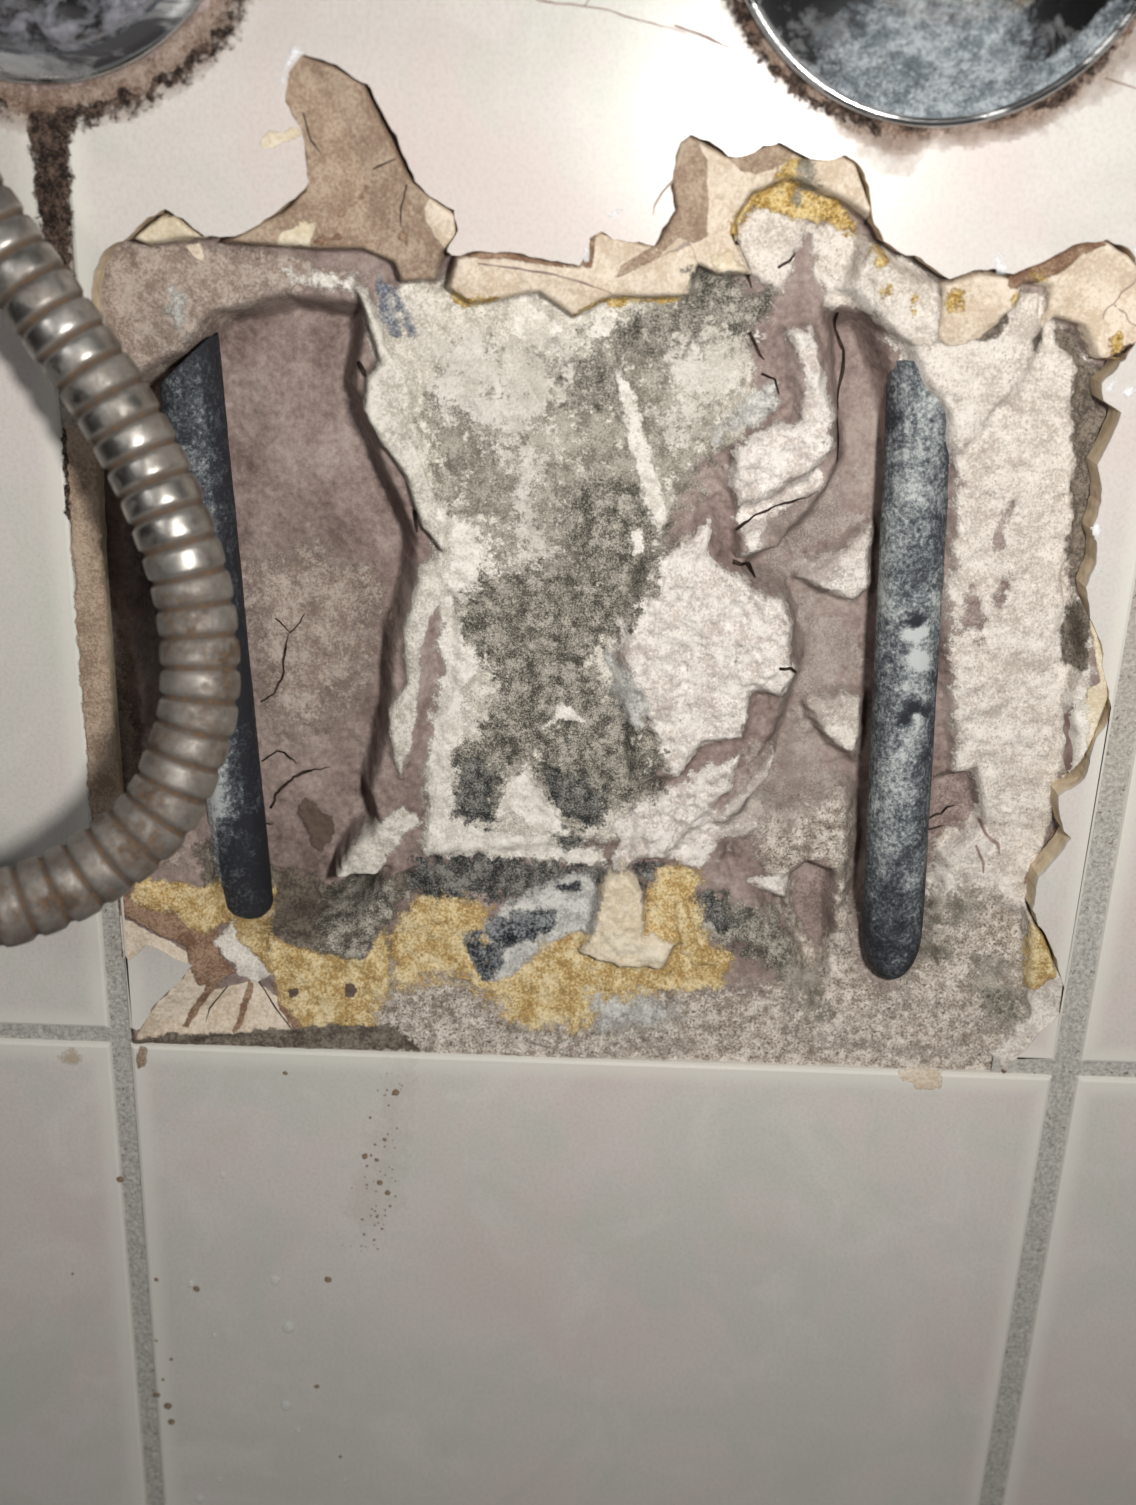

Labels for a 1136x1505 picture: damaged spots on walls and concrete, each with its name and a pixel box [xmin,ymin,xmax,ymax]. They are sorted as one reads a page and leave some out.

water stain [26,109,76,277]
crack [538,0,732,50]
water stain [61,424,120,821]
water stain [374,267,767,907]
spalling [101,46,1136,1090]